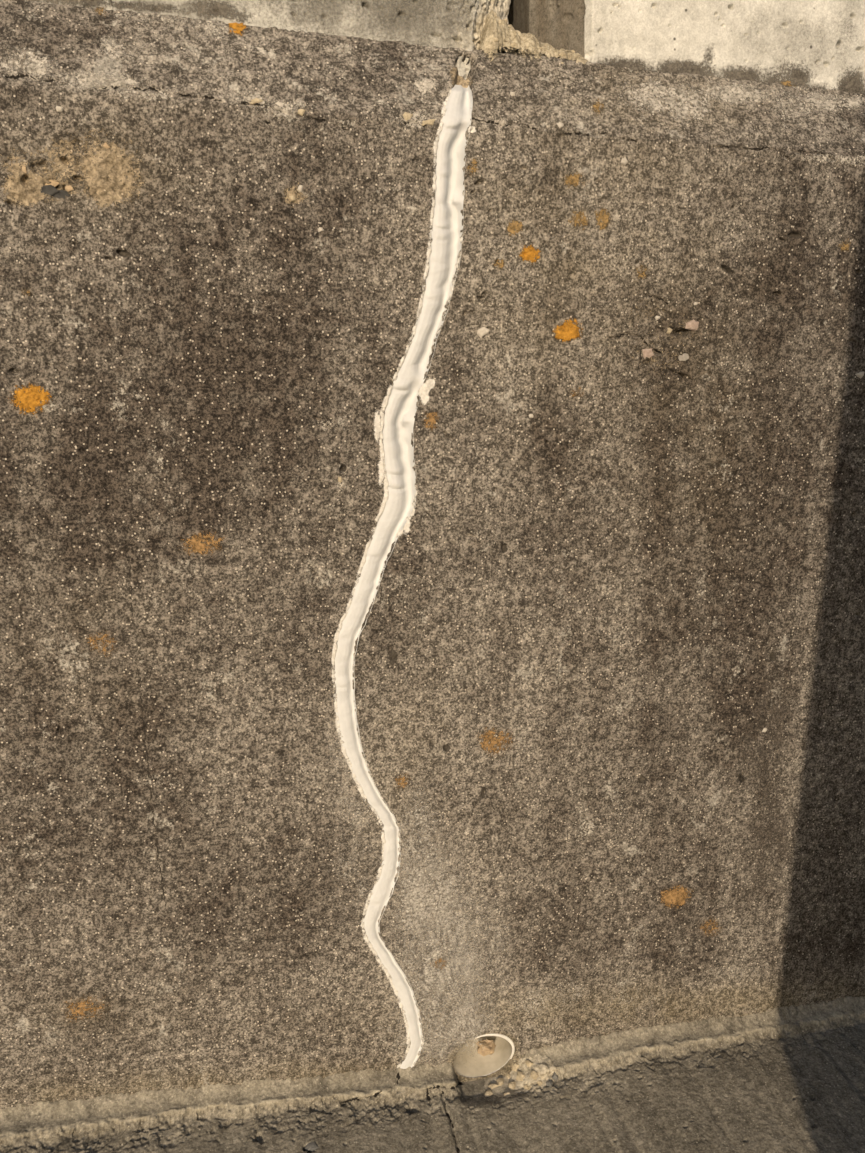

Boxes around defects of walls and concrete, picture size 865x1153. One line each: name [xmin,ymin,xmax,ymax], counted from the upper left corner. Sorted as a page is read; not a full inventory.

crack [5,74,57,82]
crack [102,86,273,126]
crack [717,145,831,159]
crack [331,55,637,1153]